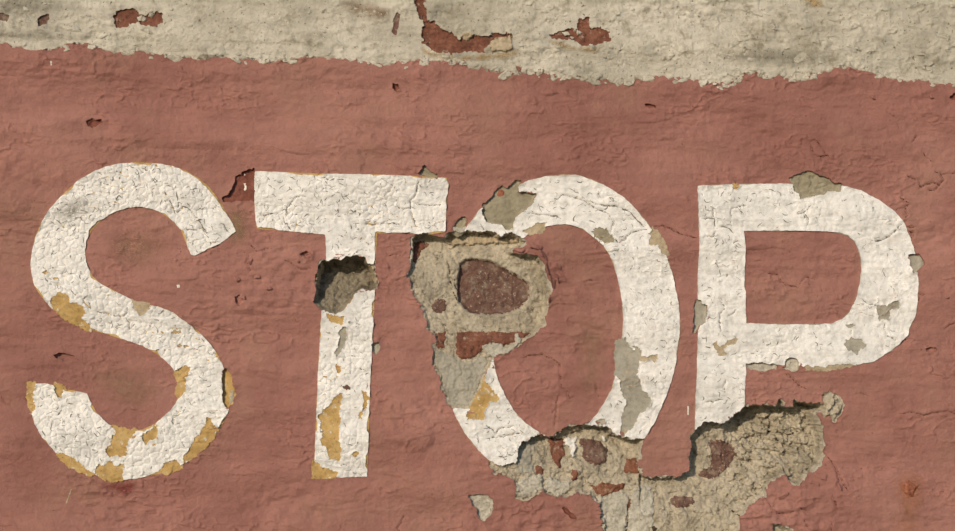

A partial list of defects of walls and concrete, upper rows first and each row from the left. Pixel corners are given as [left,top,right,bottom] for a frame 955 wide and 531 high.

flaking render [44,0,173,55]
flaking render [355,0,902,90]
peeling [50,292,92,332]
spalling [296,251,379,373]
spalling [406,180,561,420]
peeling [173,365,190,399]
peeling [222,368,237,408]
peeling [55,425,158,483]
peeling [159,417,219,475]
peeling [311,385,371,479]
spalling [489,337,845,531]
spalling [468,494,493,521]